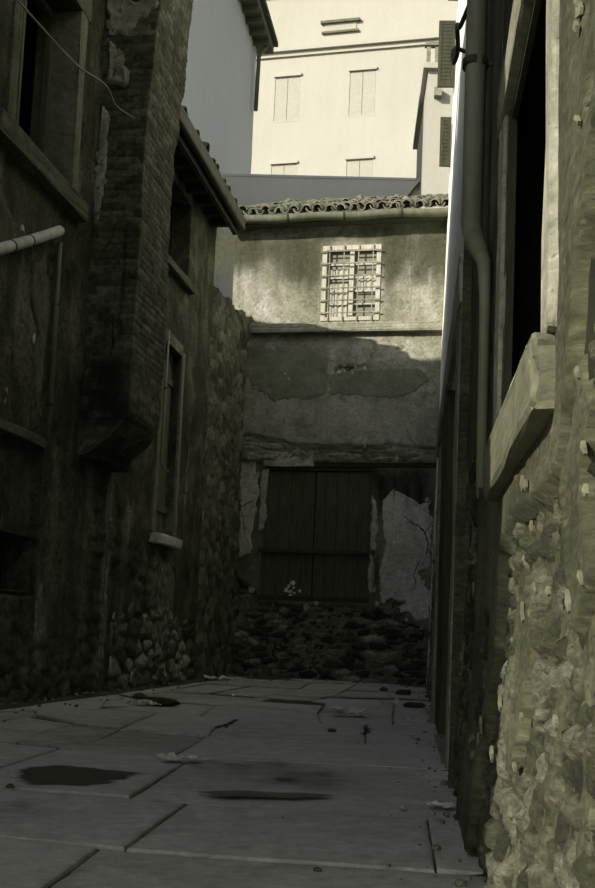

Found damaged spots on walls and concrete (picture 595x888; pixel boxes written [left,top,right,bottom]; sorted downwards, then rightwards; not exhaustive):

peeling [106,0,160,88]
spalling [232,489,437,685]
spalling [239,437,437,558]
crack [405,517,433,593]